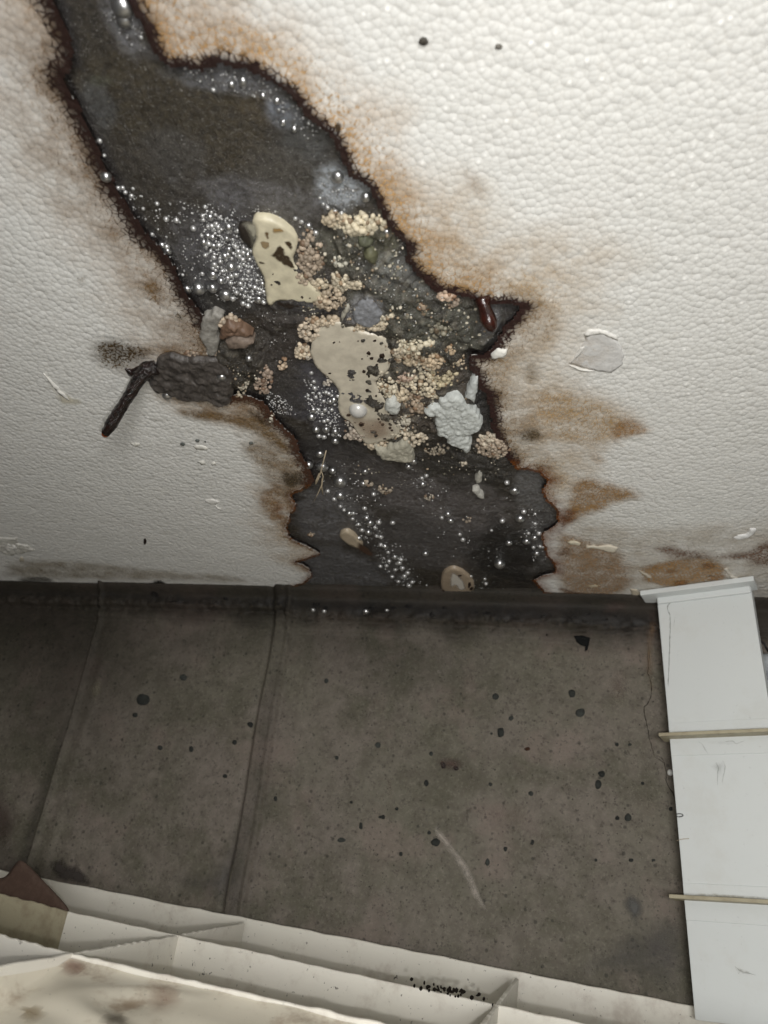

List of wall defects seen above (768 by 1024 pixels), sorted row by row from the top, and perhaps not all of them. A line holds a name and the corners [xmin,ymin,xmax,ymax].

damp [24,0,206,353]
damp [129,0,568,493]
damp [95,340,150,369]
spalling [569,329,624,373]
damp [183,395,315,570]